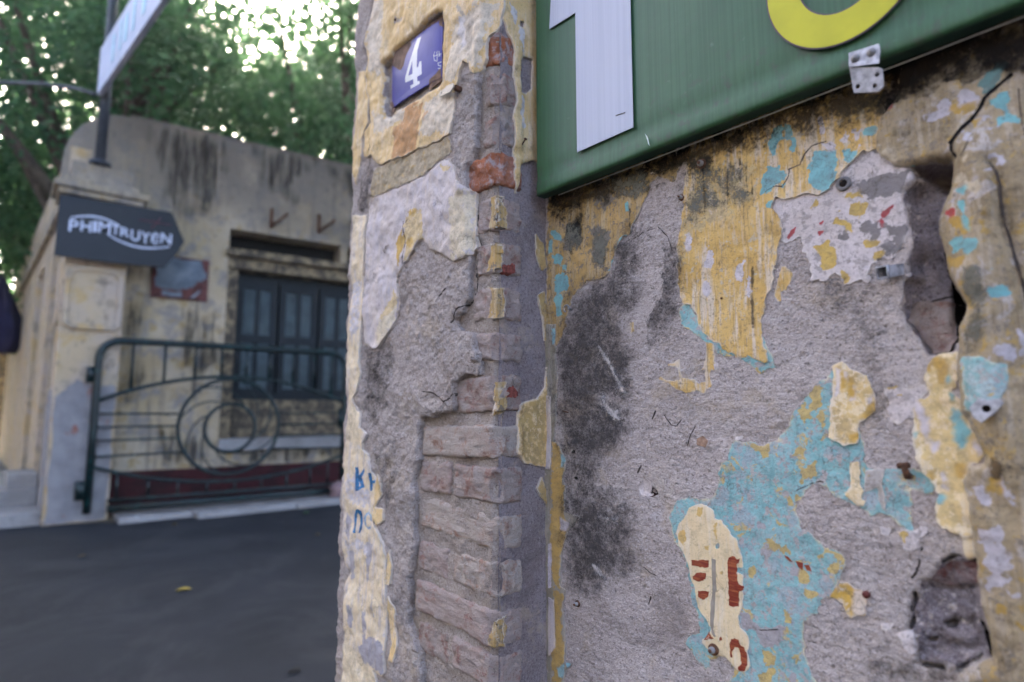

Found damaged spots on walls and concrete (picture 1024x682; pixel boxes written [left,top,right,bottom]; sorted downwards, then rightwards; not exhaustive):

crack [948,73,1024,158]
leakage [159,130,224,209]
leakage [334,162,372,211]
spalling [335,0,992,682]
leakage [547,15,1024,591]